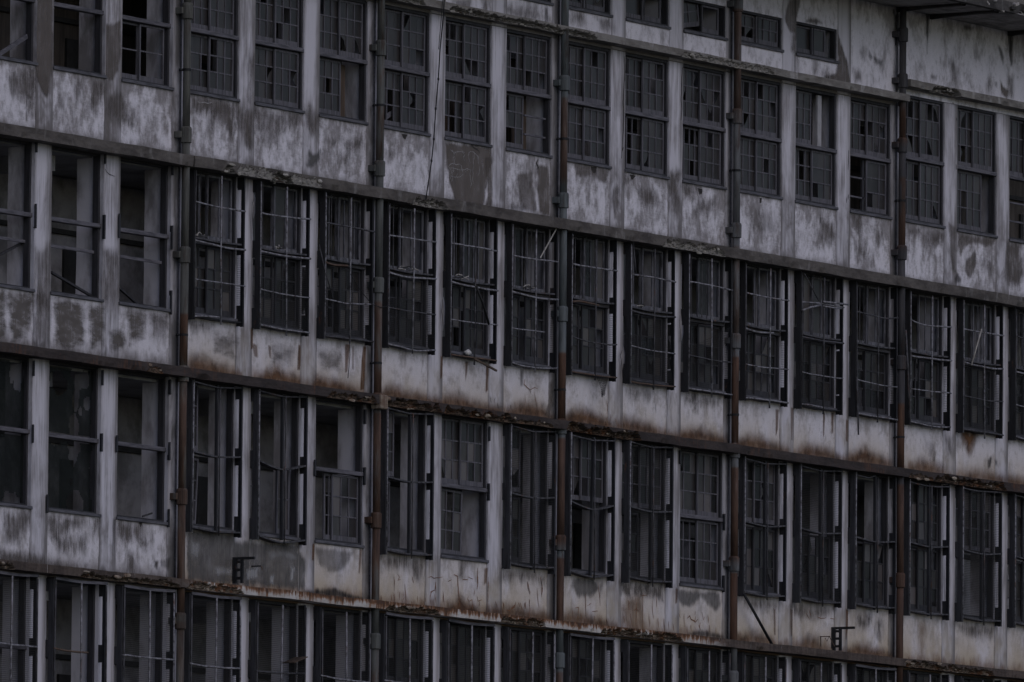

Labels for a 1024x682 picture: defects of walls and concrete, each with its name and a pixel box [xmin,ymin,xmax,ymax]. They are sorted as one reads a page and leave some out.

water stain [91,82,129,123]
water stain [193,98,317,148]
water stain [448,150,492,206]
water stain [669,172,713,212]
rust [260,346,301,384]
rust [313,347,366,390]
rust [803,448,884,465]
rust [962,432,977,452]
water stain [0,511,60,566]
water stain [47,517,83,551]
water stain [114,521,146,573]
rust [450,598,537,617]